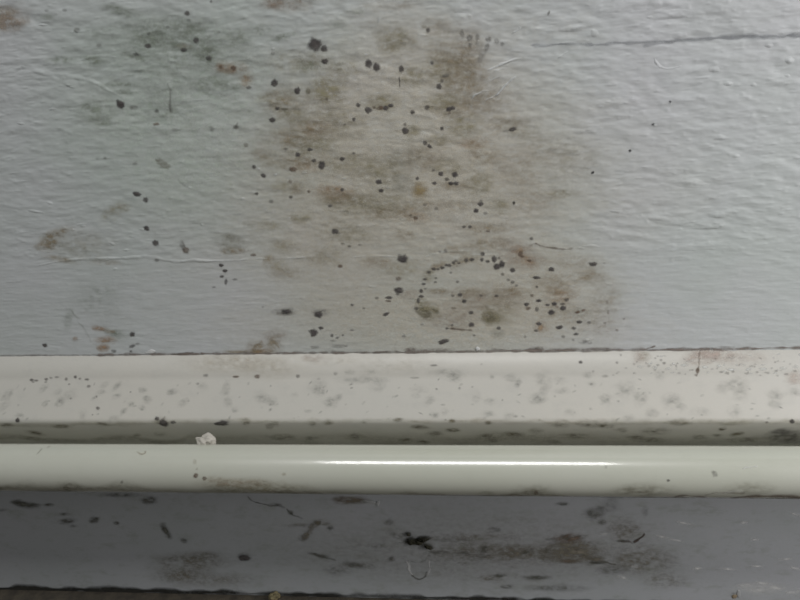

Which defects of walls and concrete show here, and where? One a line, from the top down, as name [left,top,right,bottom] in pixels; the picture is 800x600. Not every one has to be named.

water stain [309,38,328,64]
crack [683,33,766,41]
water stain [288,66,473,207]
water stain [465,241,515,272]
water stain [416,251,466,317]
water stain [438,295,506,344]